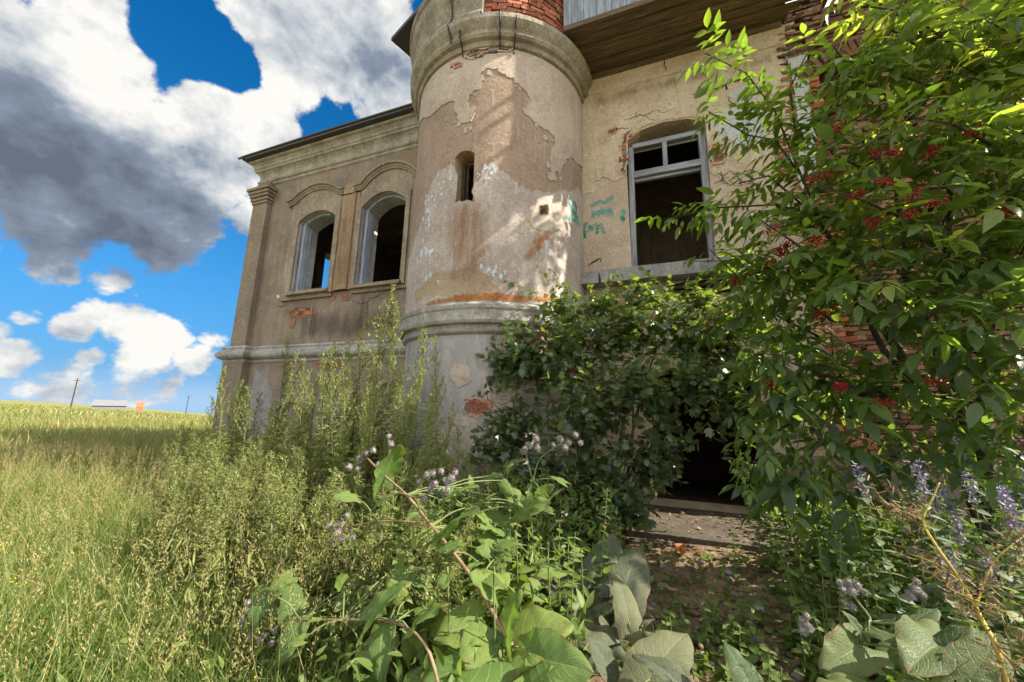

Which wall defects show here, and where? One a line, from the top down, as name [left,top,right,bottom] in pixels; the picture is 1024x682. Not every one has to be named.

crack [614,110,669,129]
peeling [405,45,794,317]
spalling [448,362,493,418]